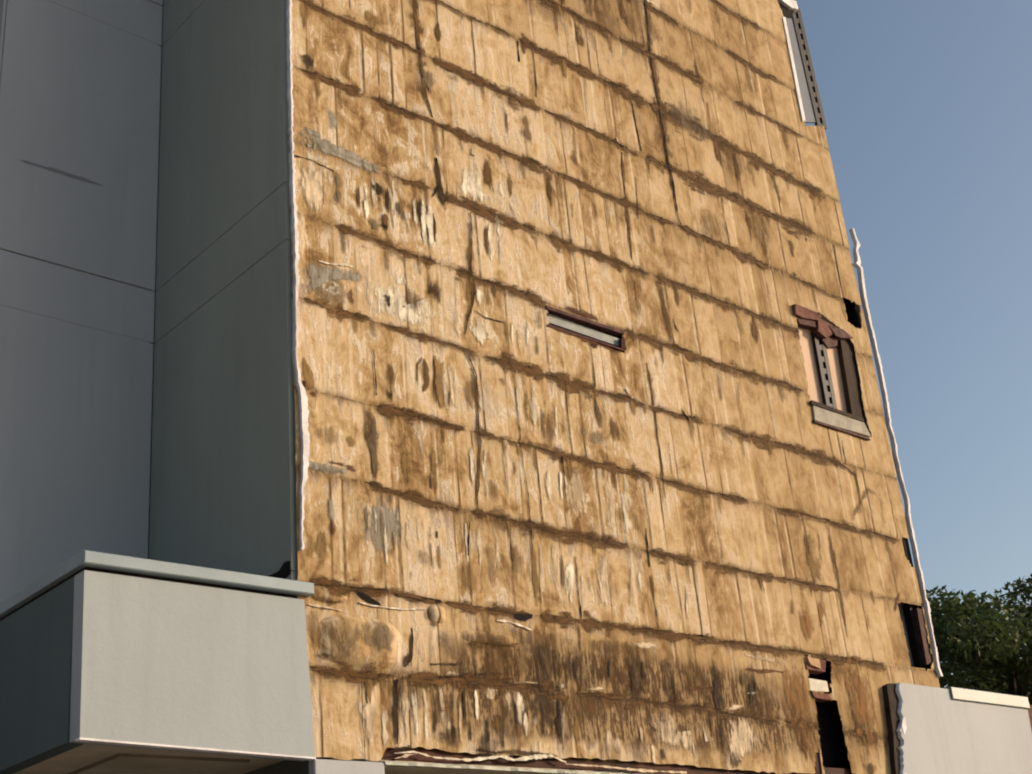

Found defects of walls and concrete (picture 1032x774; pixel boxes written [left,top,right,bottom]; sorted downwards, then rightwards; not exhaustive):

peeling [297,111,436,248]
leakage [301,0,824,271]
crack [621,0,681,258]
peeling [302,261,441,325]
peeling [358,499,435,568]
leakage [348,356,465,511]
crack [411,0,504,556]
leakage [303,297,704,445]
leakage [479,410,749,511]
leakage [548,232,802,395]
leakage [648,534,838,595]
leakage [310,565,886,767]